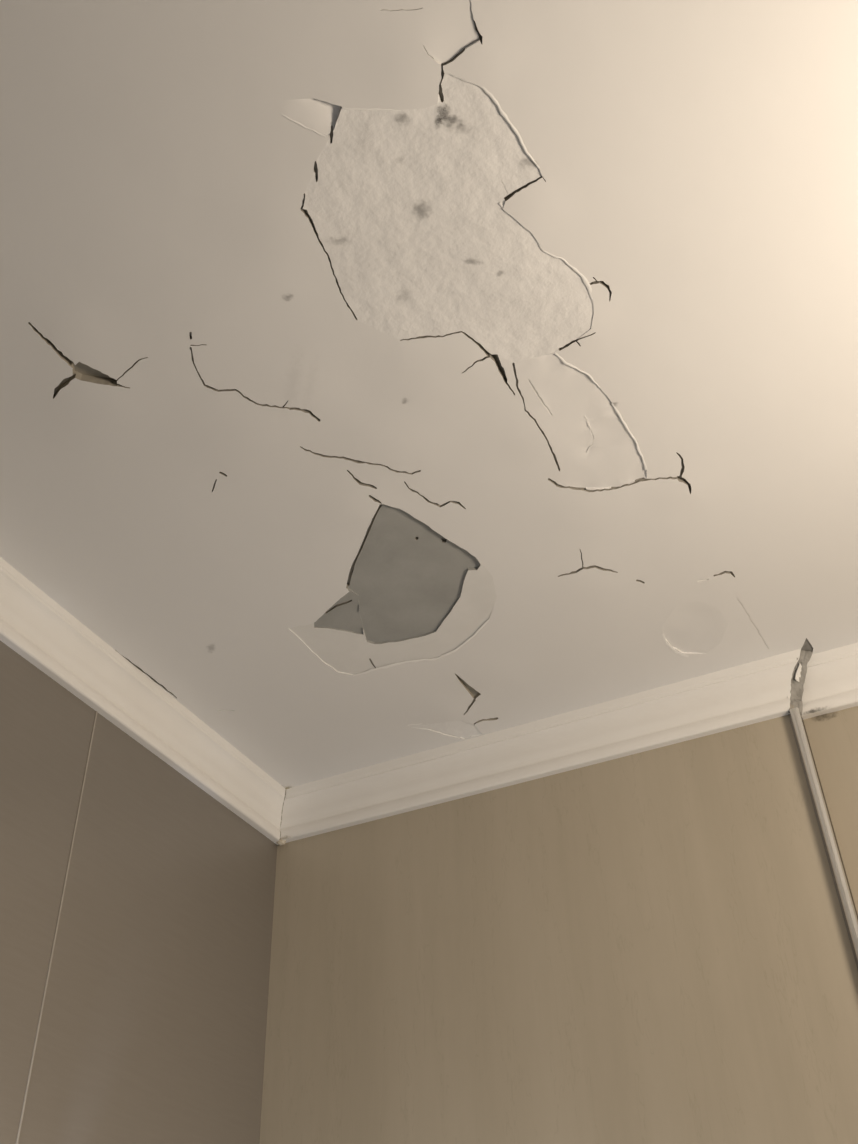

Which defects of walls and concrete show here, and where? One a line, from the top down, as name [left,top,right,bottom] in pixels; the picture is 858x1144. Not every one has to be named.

crack [380,5,422,13]
crack [423,0,482,103]
crack [300,125,357,320]
crack [501,176,546,201]
crack [590,277,612,301]
crack [189,332,320,422]
crack [400,331,691,494]
crack [300,446,466,509]
flaking render [288,504,497,676]
crack [558,550,644,584]